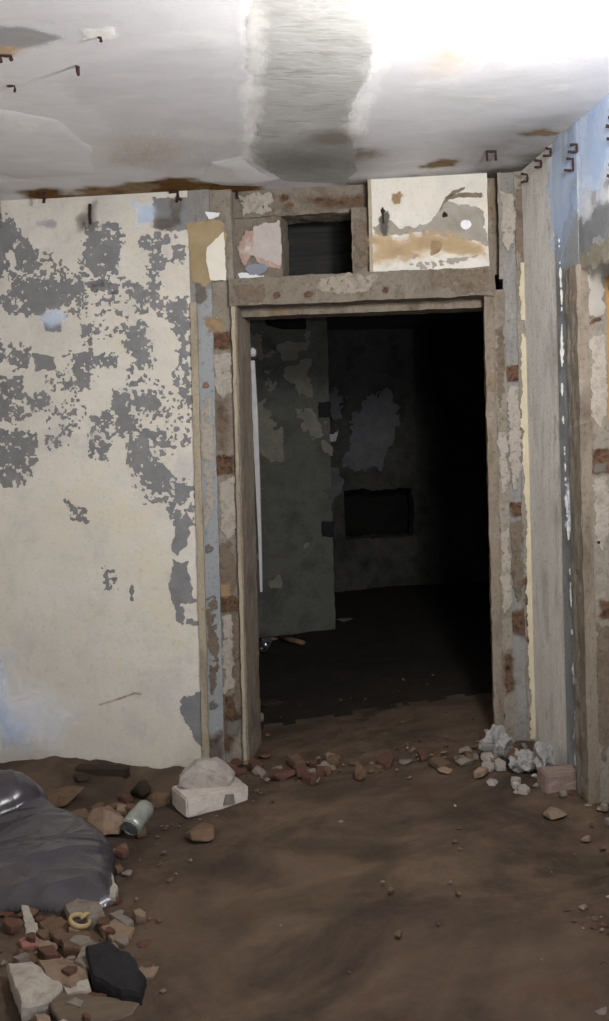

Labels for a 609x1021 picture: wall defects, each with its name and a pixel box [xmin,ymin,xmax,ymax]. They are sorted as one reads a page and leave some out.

corrosion [22,178,261,199]
peeling [206,232,281,303]
peeling [314,201,490,295]
flaking render [500,189,525,320]
peeling [250,331,401,502]
flaking render [589,334,608,427]
peeling [0,197,242,747]
peeling [495,326,535,739]
flaking render [592,476,609,550]